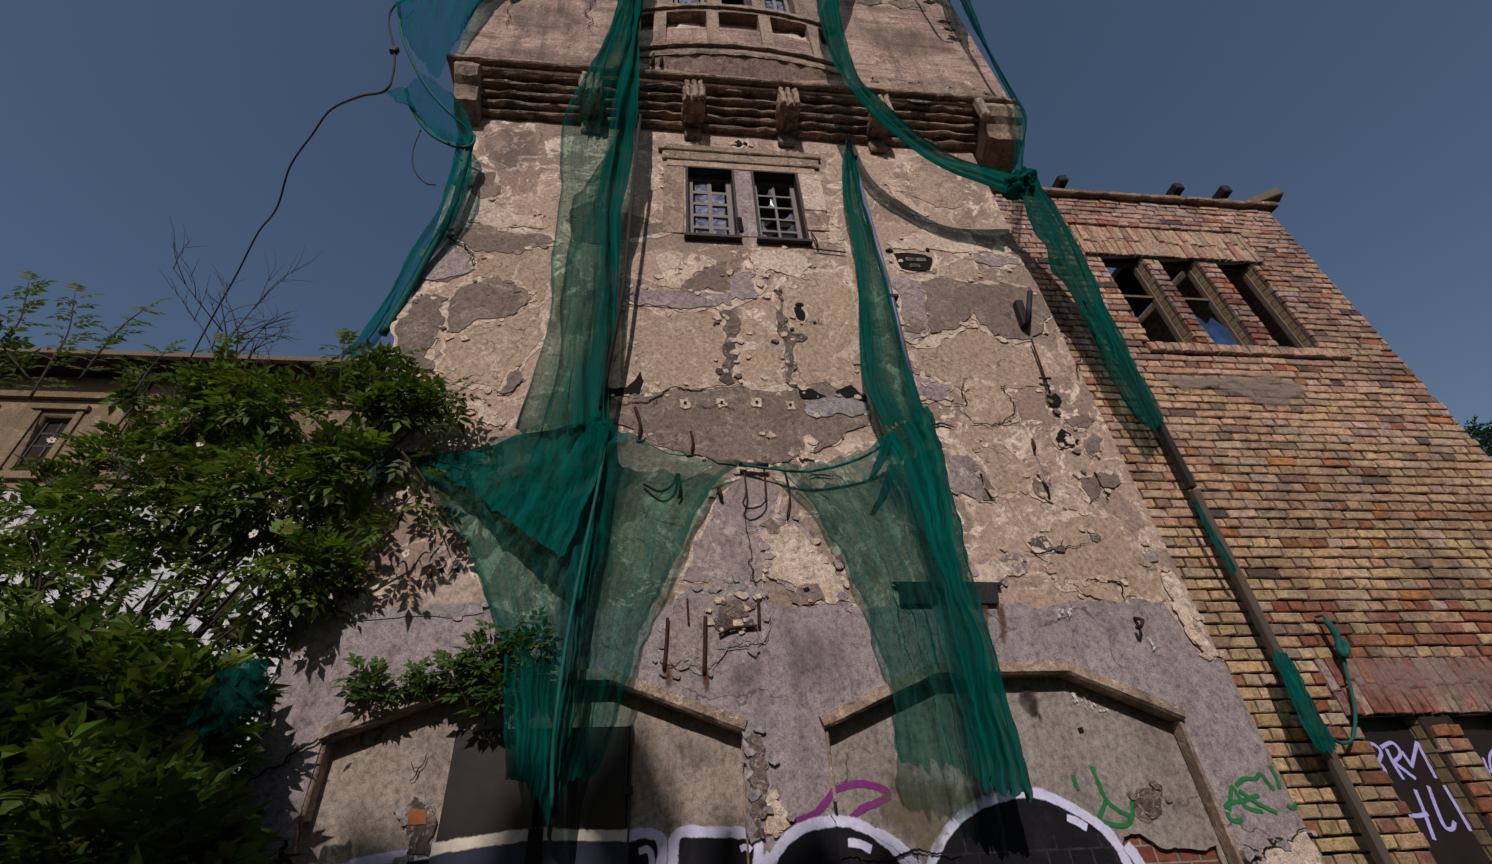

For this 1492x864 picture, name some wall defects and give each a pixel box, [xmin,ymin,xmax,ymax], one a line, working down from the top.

peeling [465,167,503,202]
peeling [621,212,675,243]
peeling [390,201,596,429]
peeling [885,237,1053,345]
peeling [609,258,872,680]
peeling [942,416,999,504]
spalling [1021,388,1122,544]
peeling [742,726,780,766]
peeling [747,787,791,844]